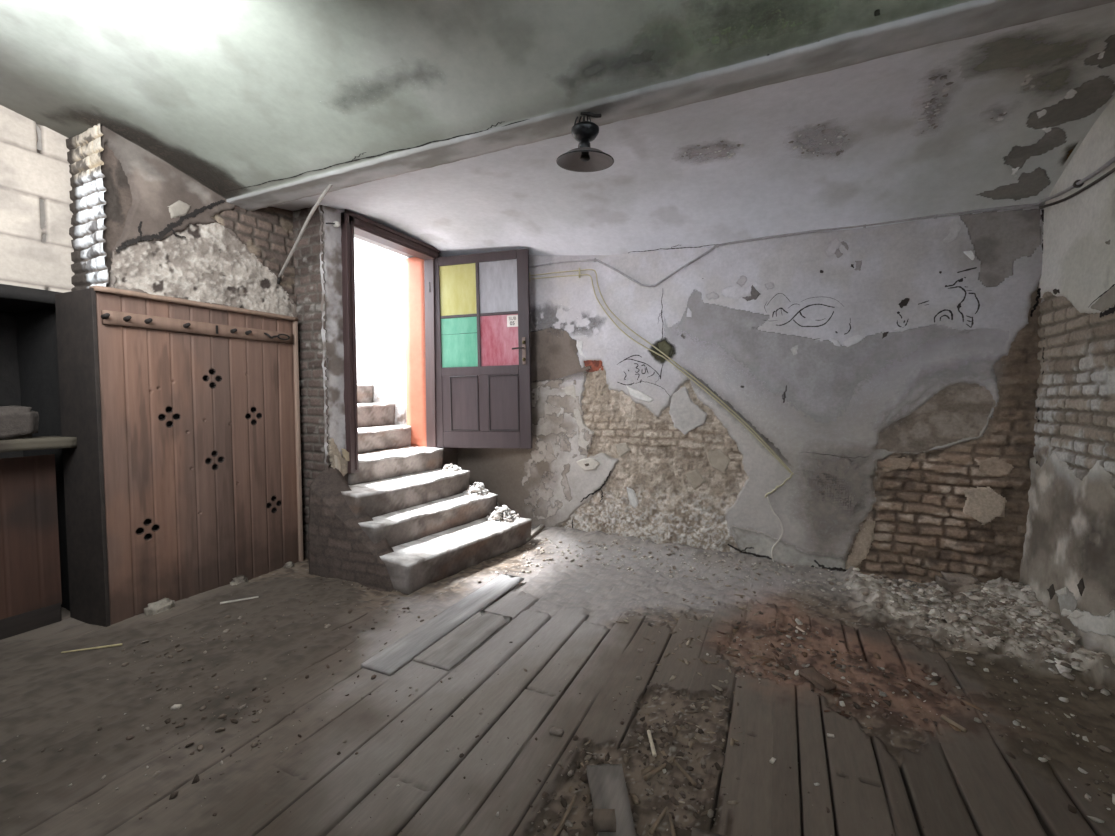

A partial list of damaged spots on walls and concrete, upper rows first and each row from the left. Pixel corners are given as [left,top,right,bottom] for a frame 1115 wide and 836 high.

water stain [581,43,671,78]
water stain [971,35,1092,93]
flaking render [101,143,296,317]
crack [116,119,528,253]
peeling [942,34,1115,287]
flaking render [522,327,748,554]
flaking render [845,286,1115,583]
peeling [1047,577,1115,637]